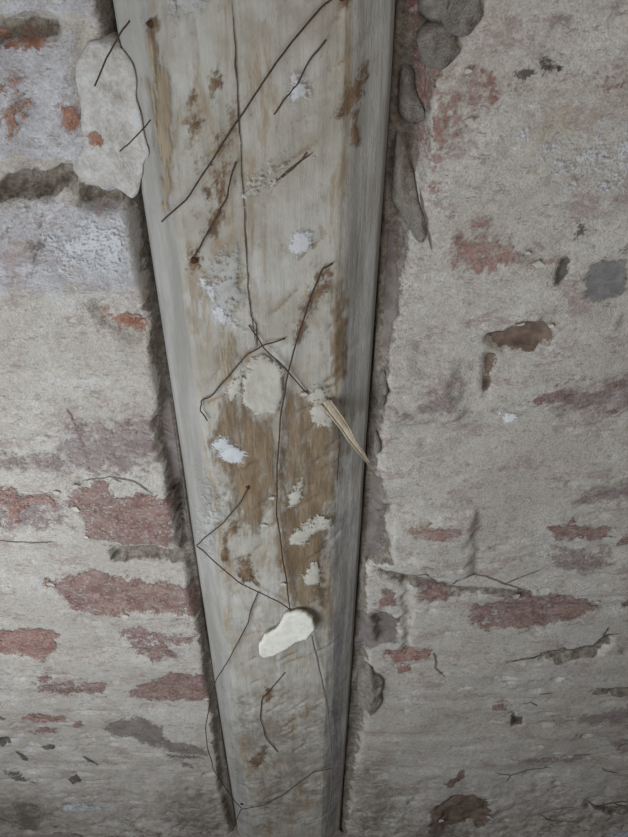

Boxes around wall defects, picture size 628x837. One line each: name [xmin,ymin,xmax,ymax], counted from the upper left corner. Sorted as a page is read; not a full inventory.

crack [232,5,258,347]
crack [276,152,313,181]
spalling [581,245,628,302]
spalling [482,321,554,392]
rust [220,522,240,562]
rust [237,553,259,586]
peeling [208,391,349,658]
crack [506,627,616,663]
spalling [427,769,492,835]